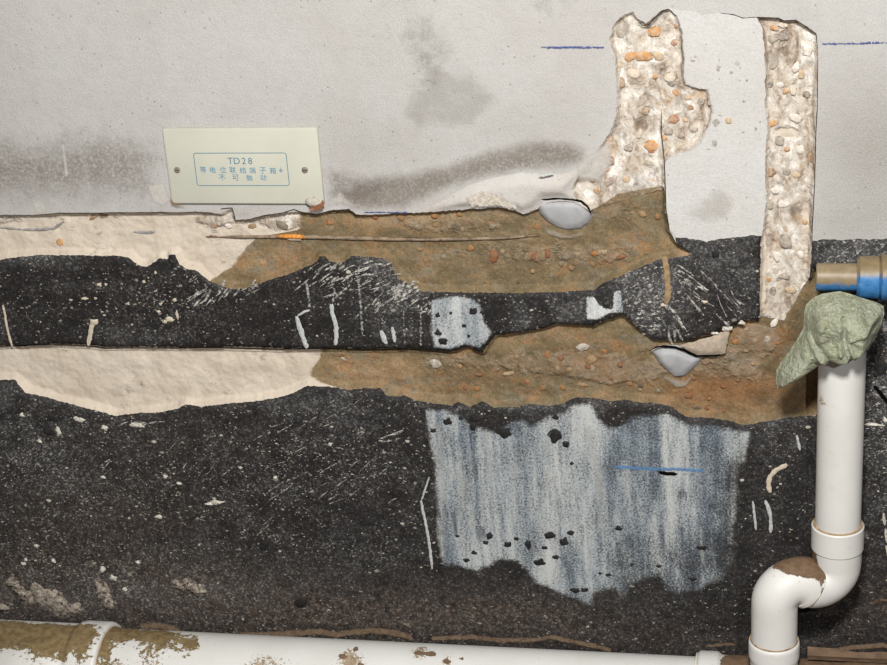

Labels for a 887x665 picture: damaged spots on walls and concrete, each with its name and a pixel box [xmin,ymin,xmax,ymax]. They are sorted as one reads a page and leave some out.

water stain [328,145,610,205]
peeling [572,8,818,328]
water stain [426,404,749,603]